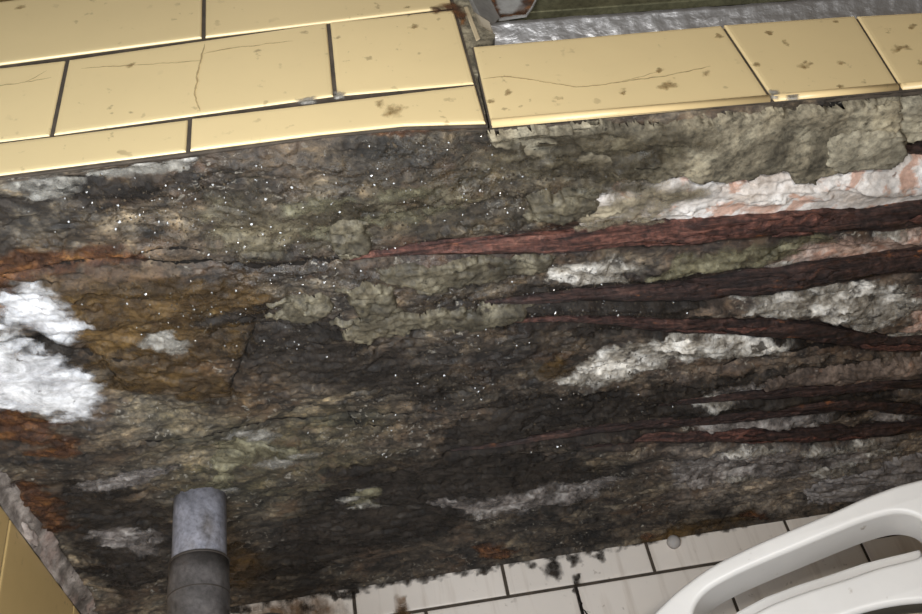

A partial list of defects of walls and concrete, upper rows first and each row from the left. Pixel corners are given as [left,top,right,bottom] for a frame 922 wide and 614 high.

corrosion [0,245,144,316]
peeling [189,94,922,451]
leakage [0,289,100,422]
leakage [196,298,462,404]
leakage [254,257,922,581]
leakage [206,430,310,491]
peeling [803,452,922,505]
peeling [0,470,98,614]
leakage [281,565,499,612]
corrosion [397,598,409,614]
leakage [510,548,605,593]
crack [574,581,588,614]